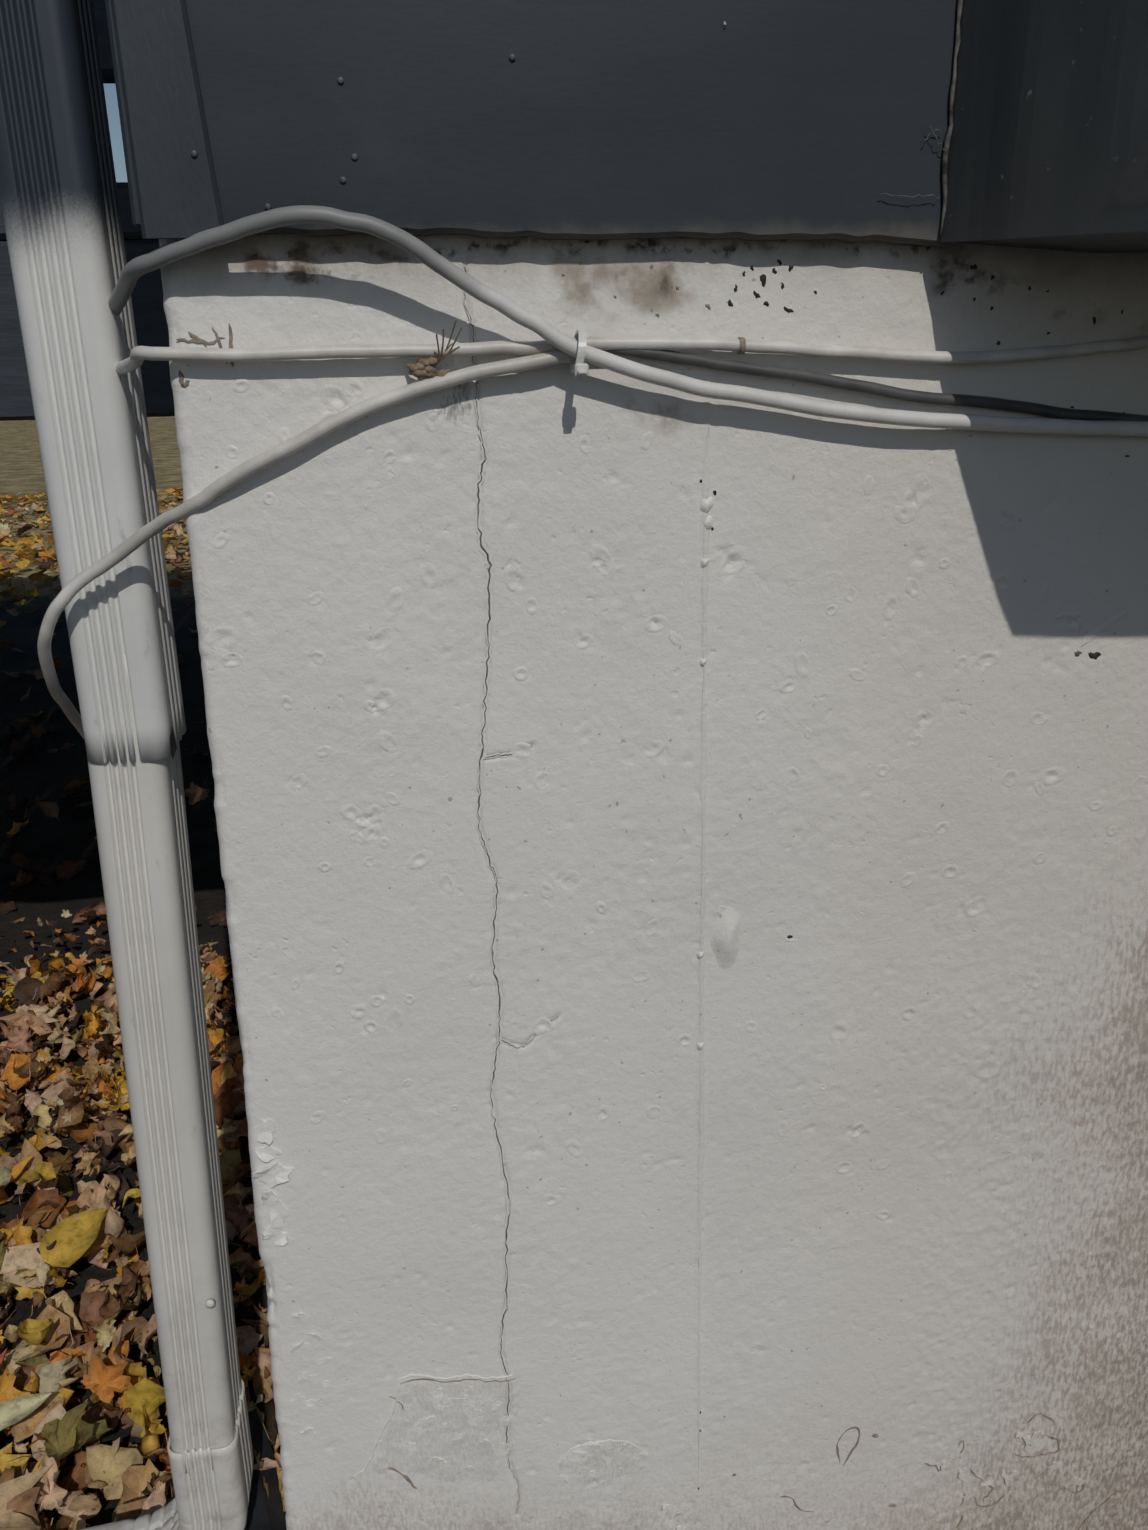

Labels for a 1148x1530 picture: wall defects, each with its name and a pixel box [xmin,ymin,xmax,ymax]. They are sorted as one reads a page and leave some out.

water stain [705,259,794,313]
crack [463,262,559,1515]
spalling [253,1118,294,1246]